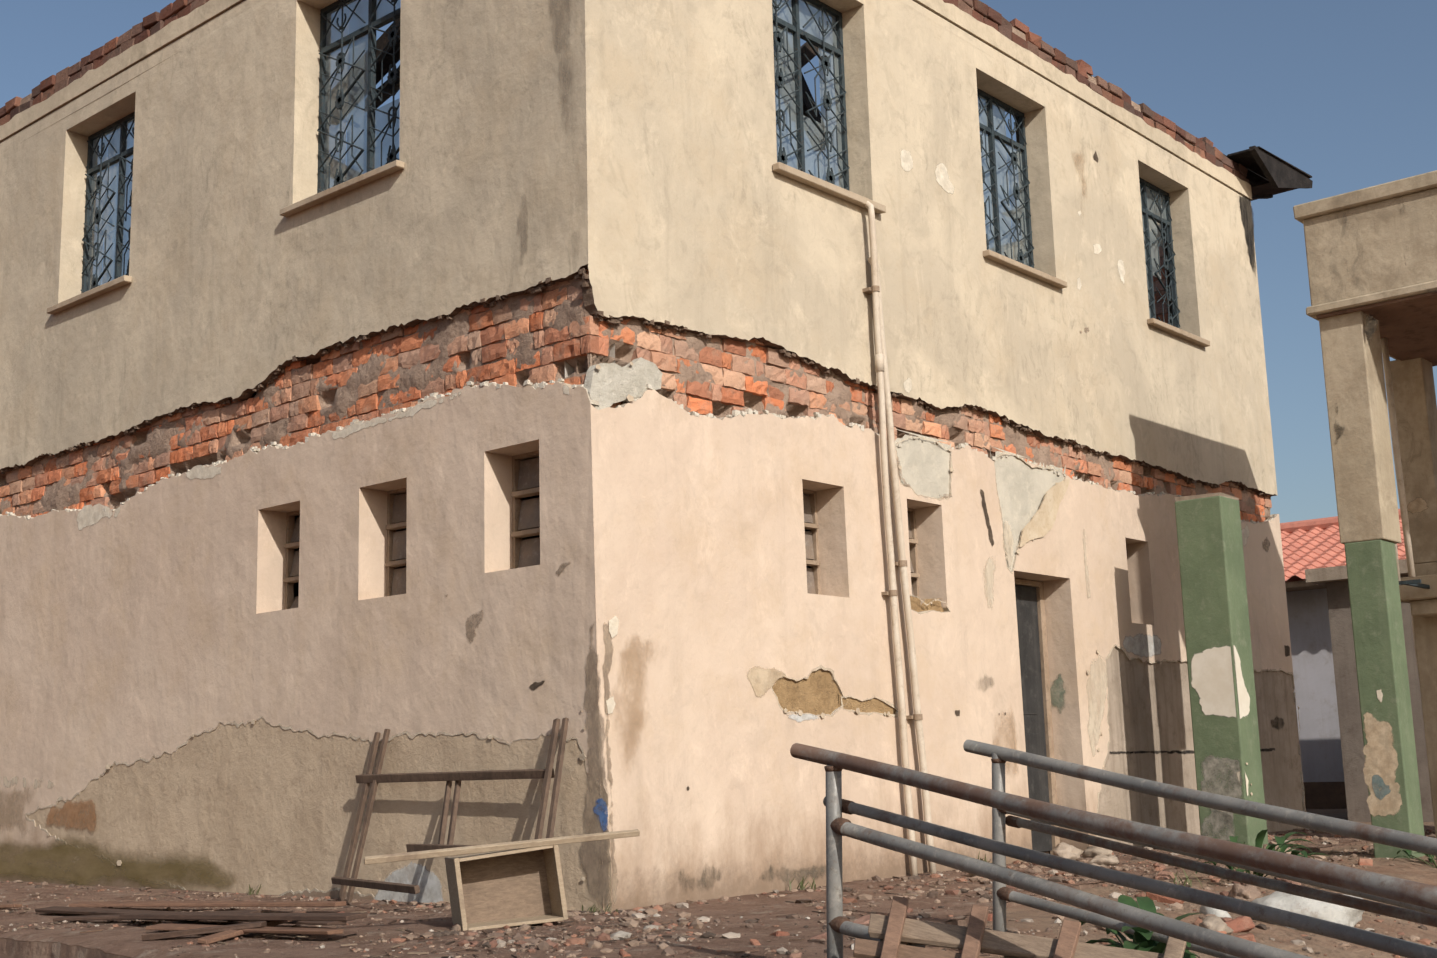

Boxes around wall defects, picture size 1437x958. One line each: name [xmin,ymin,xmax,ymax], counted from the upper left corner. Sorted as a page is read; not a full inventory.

flaking render [1153,247,1168,323]
spalling [0,268,1276,574]
crack [980,489,994,546]
spalling [466,610,483,643]
peeling [747,665,899,722]
peeling [25,616,619,912]
peeling [1087,634,1305,841]
peeling [1363,690,1402,816]
leakage [0,841,232,888]